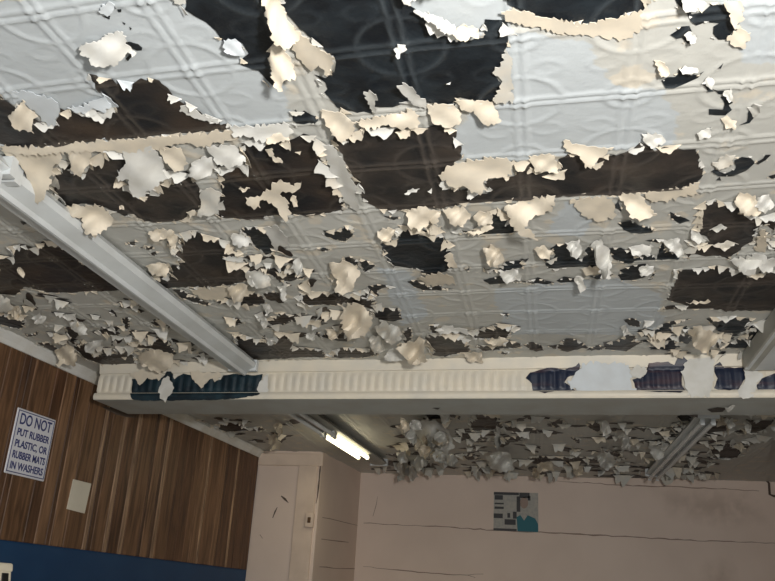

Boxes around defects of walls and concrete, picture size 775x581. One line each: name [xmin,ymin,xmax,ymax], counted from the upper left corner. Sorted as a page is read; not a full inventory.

peeling [0,0,775,402]
peeling [195,417,300,451]
peeling [371,408,698,487]
peeling [660,405,775,485]
crack [316,466,766,544]